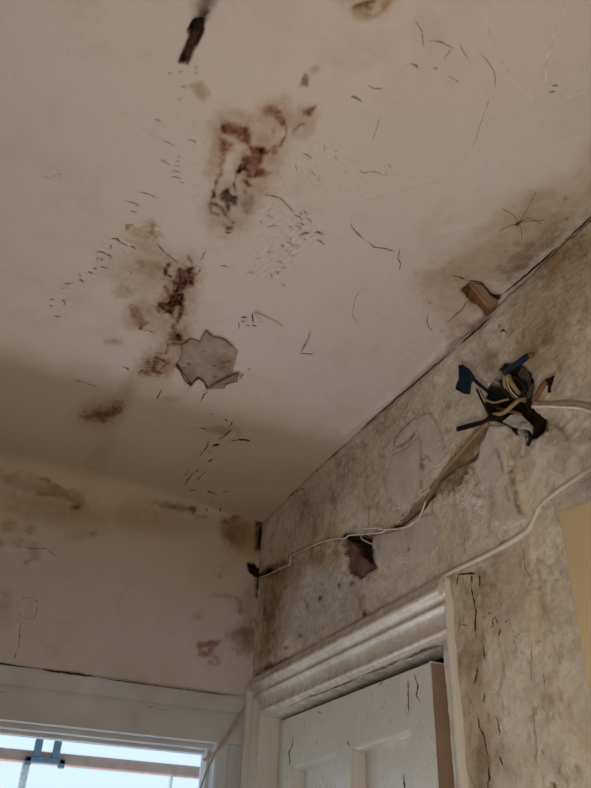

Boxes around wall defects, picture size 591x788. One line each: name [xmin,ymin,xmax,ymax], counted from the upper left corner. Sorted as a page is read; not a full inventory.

crack [503,217,591,294]
flaking render [462,278,501,317]
peeling [170,331,238,393]
crack [290,316,506,496]
crack [183,392,250,512]
flaking render [344,534,377,579]
crack [456,572,545,788]